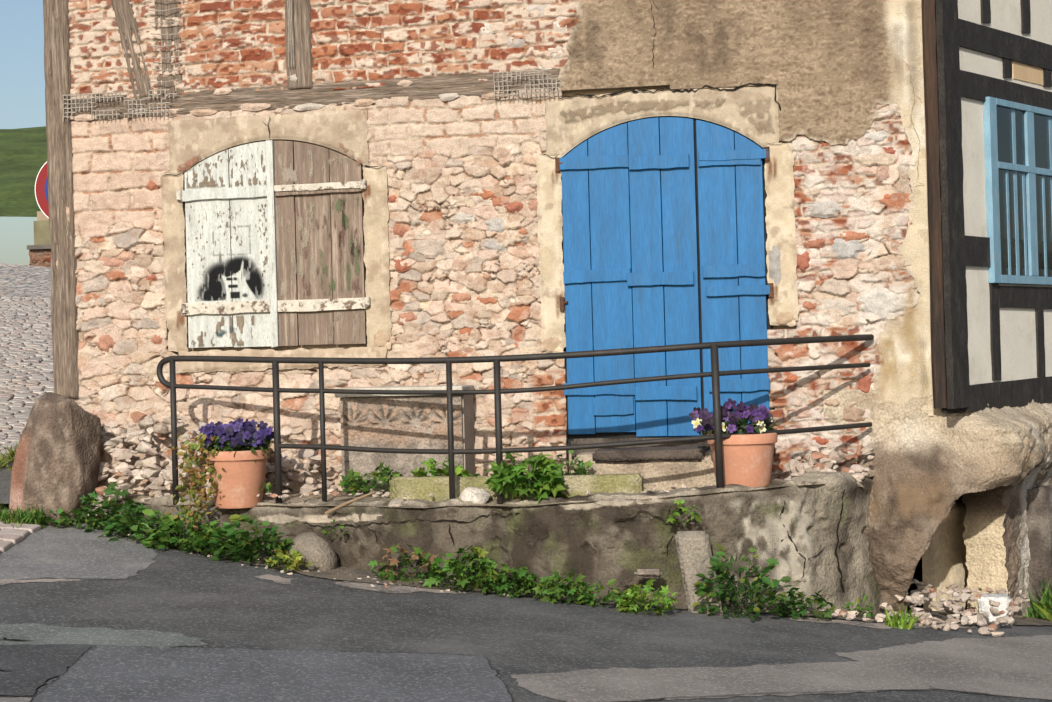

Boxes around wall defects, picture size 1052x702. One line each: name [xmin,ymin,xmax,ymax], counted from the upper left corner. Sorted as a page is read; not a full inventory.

crack [559,0,781,111]
flaking render [66,0,581,520]
flaking render [767,103,920,481]
crack [774,490,845,593]